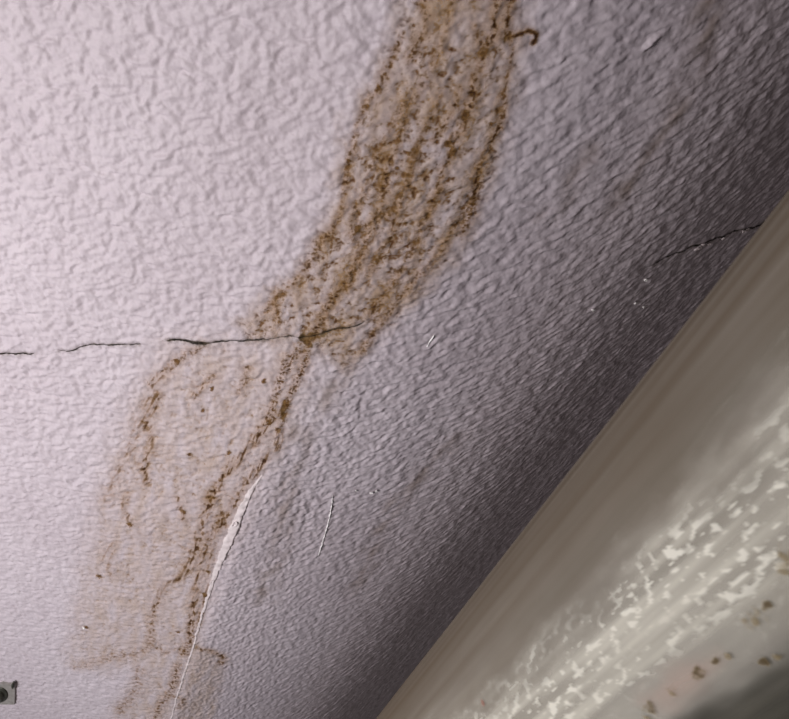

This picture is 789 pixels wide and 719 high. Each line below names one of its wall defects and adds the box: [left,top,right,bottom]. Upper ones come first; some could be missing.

crack [645,223,763,268]
crack [60,343,139,352]
crack [167,323,362,345]
water stain [140,421,158,497]
water stain [149,338,311,655]